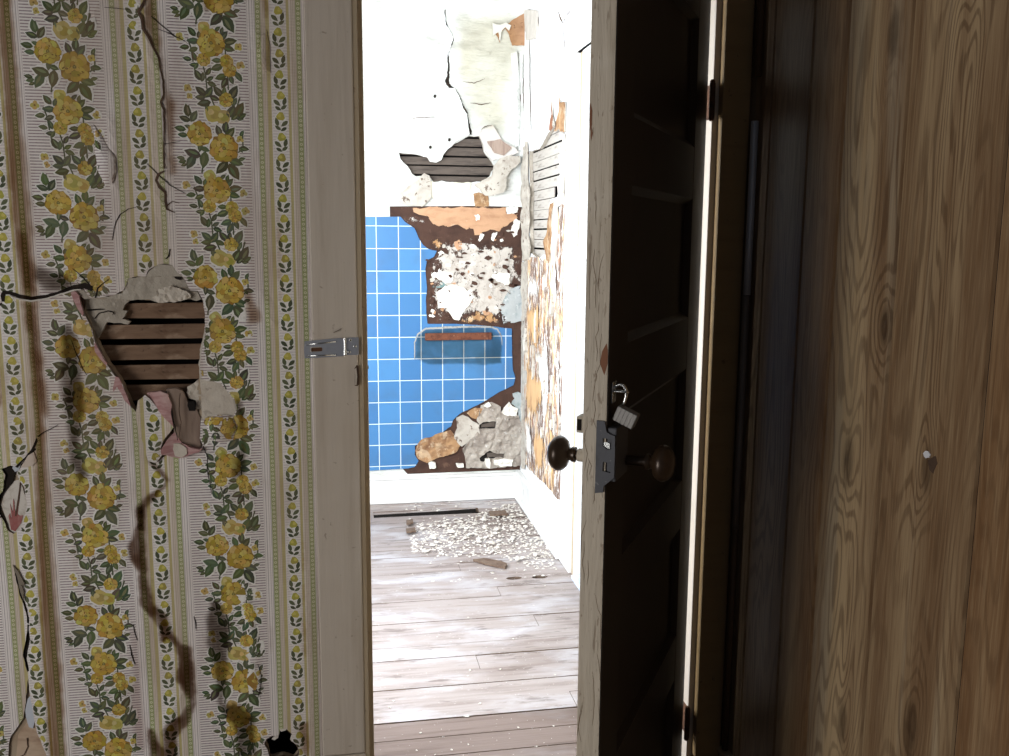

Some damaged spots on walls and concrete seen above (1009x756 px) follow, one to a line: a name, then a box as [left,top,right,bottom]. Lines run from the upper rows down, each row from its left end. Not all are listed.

crack [104,0,186,213]
crack [443,10,492,135]
crack [0,269,109,306]
flaking render [71,264,237,420]
spalling [364,88,566,500]
crack [0,425,57,529]
peeling [21,452,37,467]
crack [13,565,30,671]
leakage [128,461,195,756]
spalling [267,730,298,754]